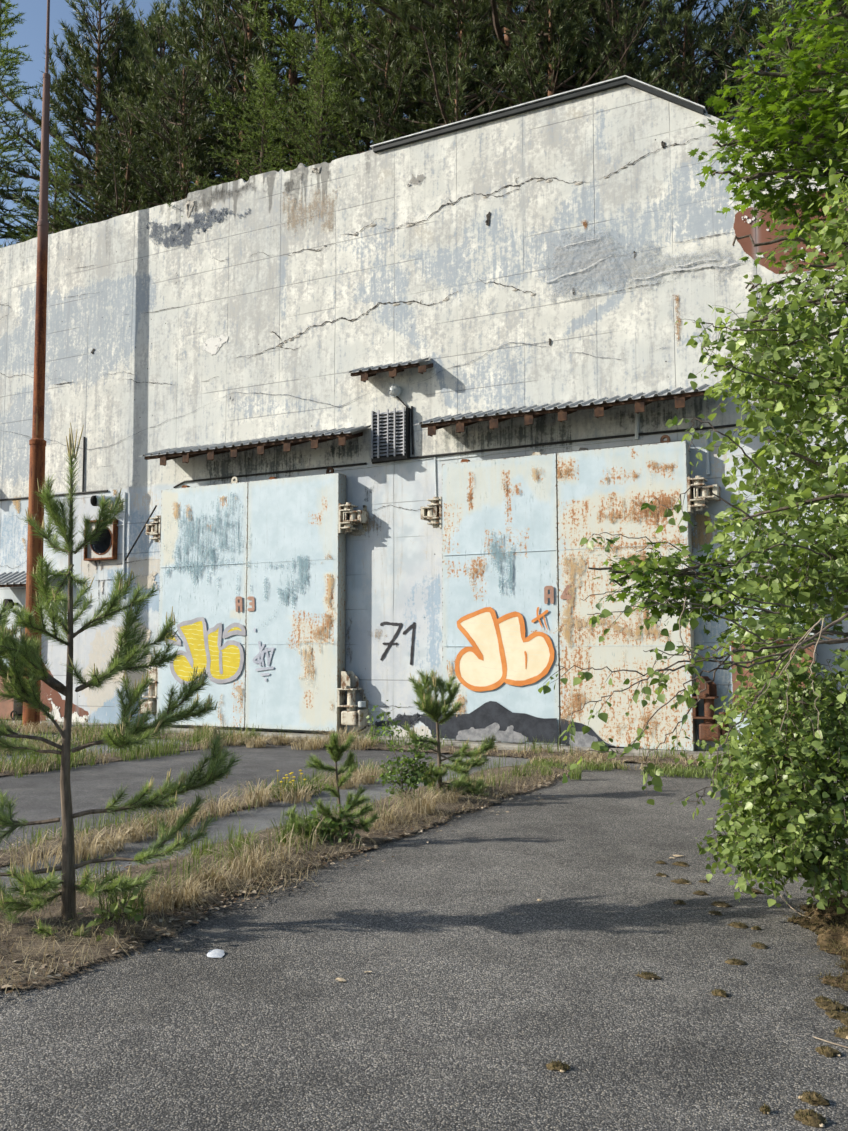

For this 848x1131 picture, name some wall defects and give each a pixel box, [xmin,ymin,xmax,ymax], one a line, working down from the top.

peeling [147,200,250,249]
damp [283,174,336,231]
crack [212,136,704,261]
crack [1,279,536,450]
rust [299,574,334,677]
rust [558,544,668,648]